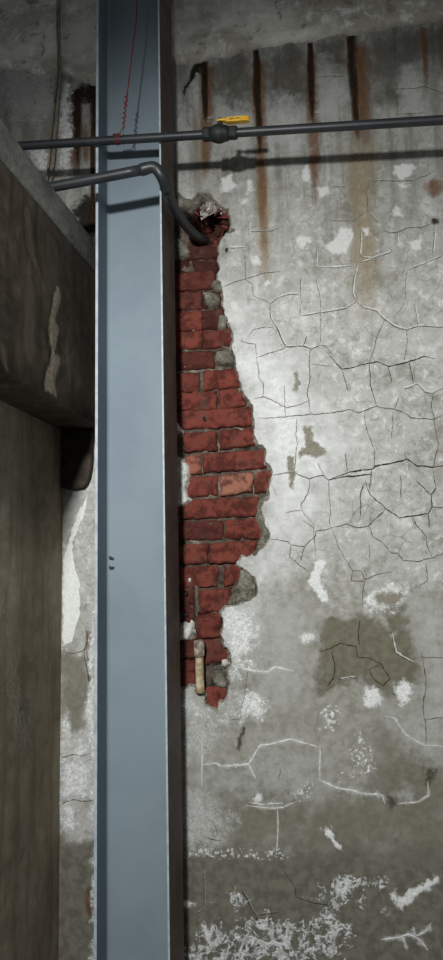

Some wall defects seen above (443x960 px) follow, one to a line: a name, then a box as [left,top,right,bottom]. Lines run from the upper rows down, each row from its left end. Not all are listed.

corrosion [201,61,212,127]
corrosion [253,50,266,217]
corrosion [307,43,318,181]
corrosion [347,35,369,131]
flaking render [174,174,273,711]
crack [221,172,443,729]
water stain [181,559,443,960]